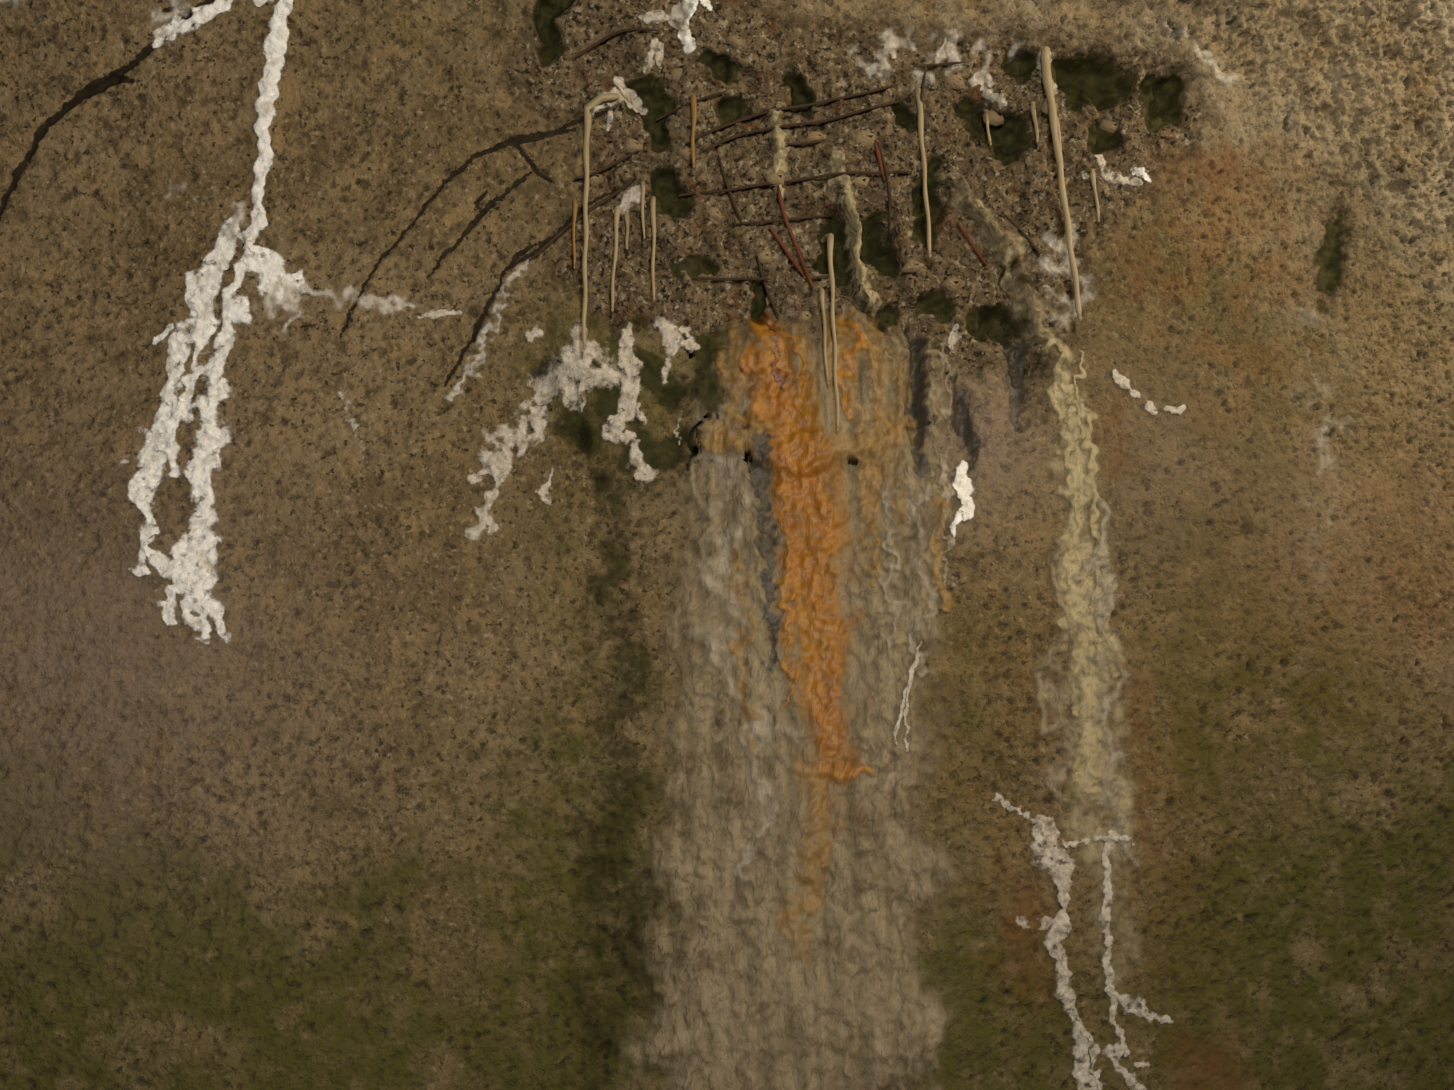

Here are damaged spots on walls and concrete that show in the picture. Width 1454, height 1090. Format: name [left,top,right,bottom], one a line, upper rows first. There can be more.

crack [0,0,215,216]
water stain [121,0,462,644]
crack [340,110,607,338]
water stain [446,260,529,401]
crack [444,186,616,387]
spalling [504,0,1218,379]
water stain [1112,369,1186,415]
water stain [465,317,800,1090]
rust [718,309,902,958]
water stain [825,322,982,1090]
water stain [992,349,1173,1090]